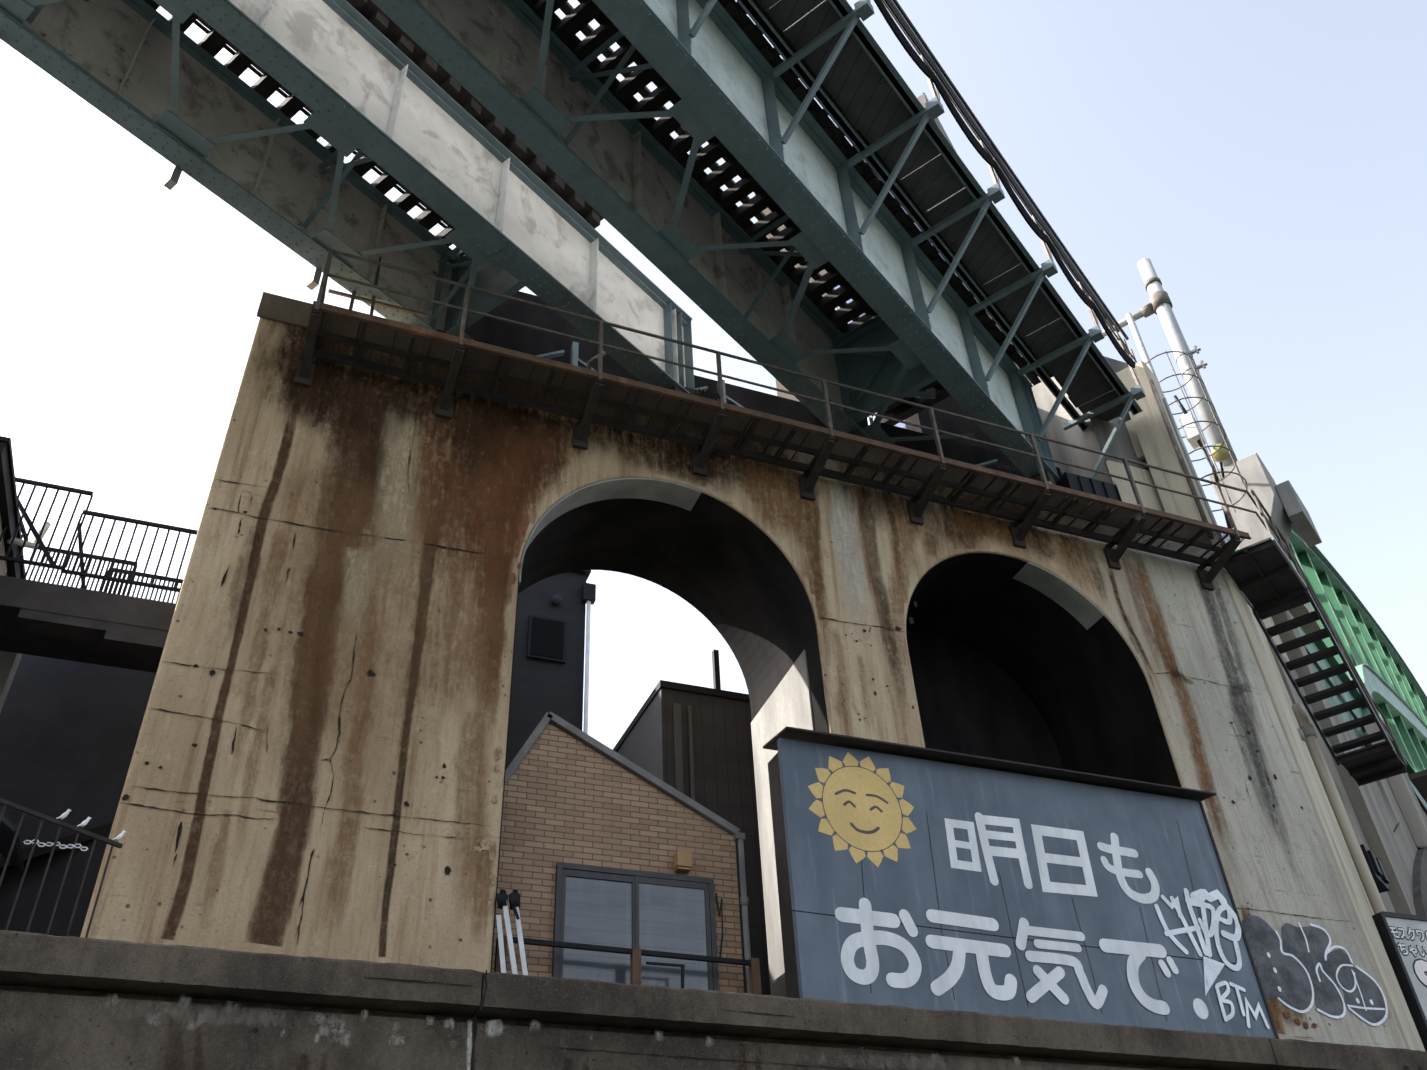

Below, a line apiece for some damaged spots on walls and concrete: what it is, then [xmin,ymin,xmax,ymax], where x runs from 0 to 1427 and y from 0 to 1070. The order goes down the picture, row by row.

corrosion [162,422,294,940]
crack [121,634,486,943]
corrosion [250,404,391,947]
corrosion [379,408,491,957]
corrosion [742,458,826,620]
corrosion [860,499,907,657]
corrosion [1095,565,1222,822]
leakage [1199,583,1277,822]
crack [364,970,487,1070]
crack [541,1046,866,1070]